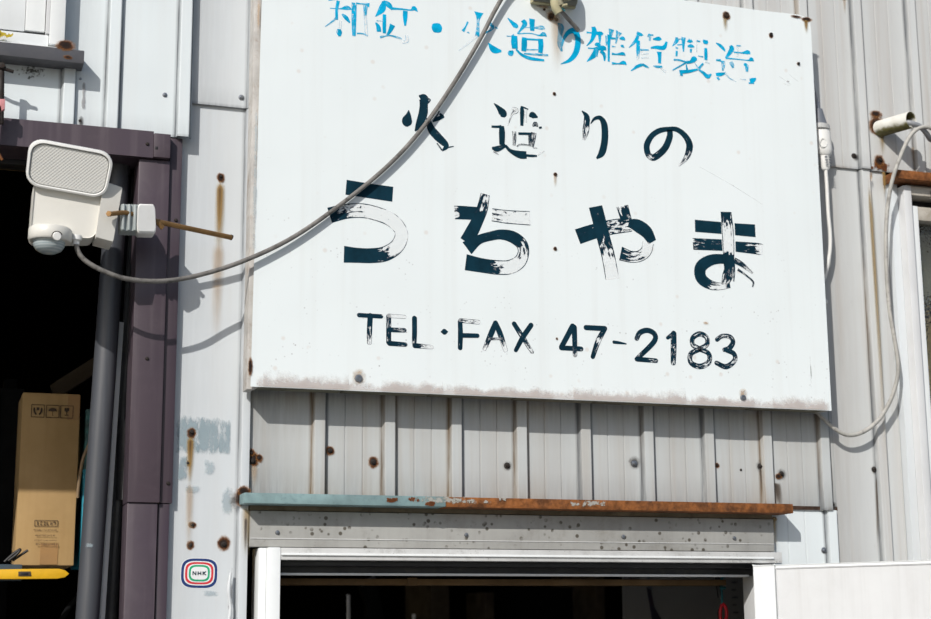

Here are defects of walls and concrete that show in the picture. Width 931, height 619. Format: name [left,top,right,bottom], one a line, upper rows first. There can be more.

corrosion [56,40,74,59]
corrosion [869,110,889,187]
corrosion [869,196,880,346]
corrosion [187,428,196,474]
corrosion [249,449,262,467]
corrosion [774,471,784,501]
corrosion [217,537,230,551]